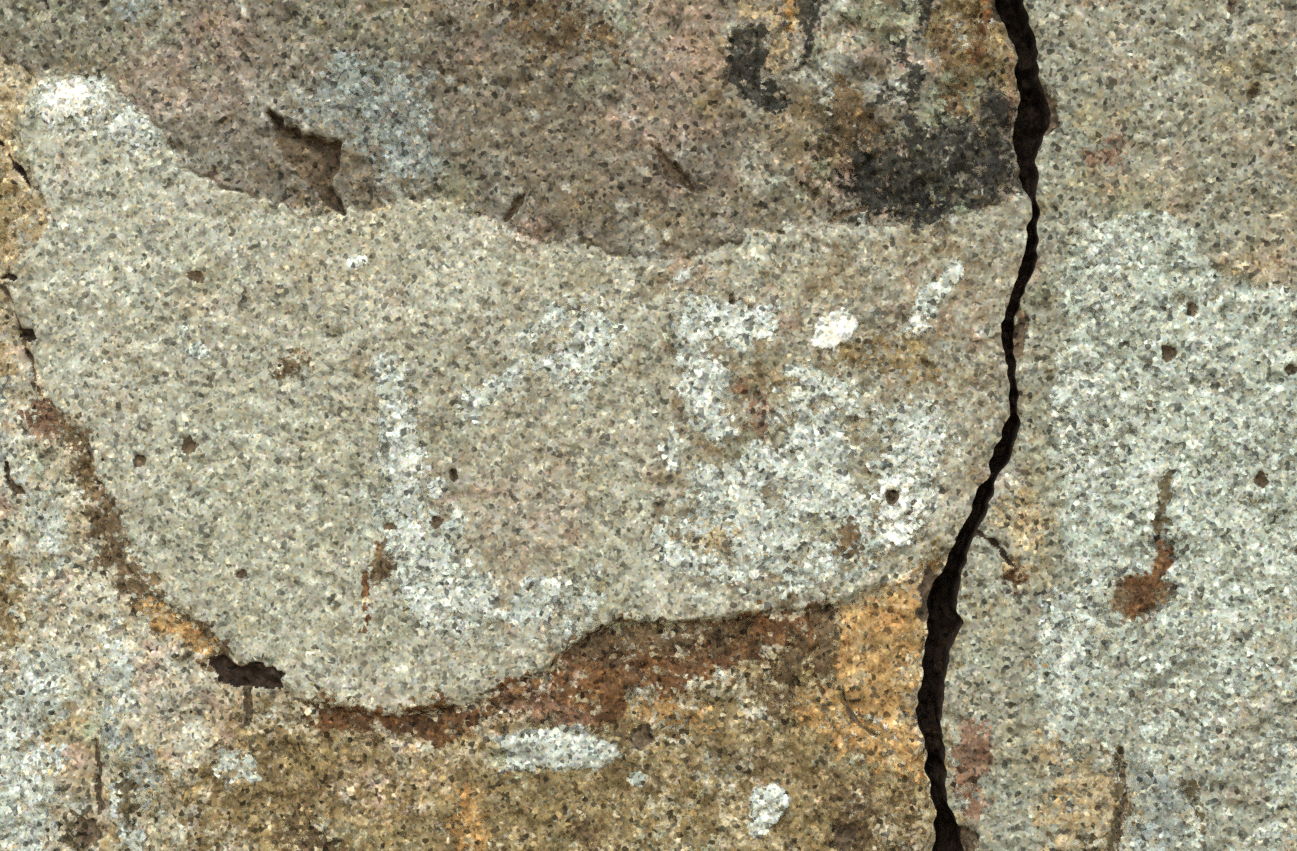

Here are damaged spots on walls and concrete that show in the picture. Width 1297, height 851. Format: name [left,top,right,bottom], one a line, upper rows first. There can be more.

leakage [799,0,1018,230]
crack [915,0,1060,851]
corrosion [1107,469,1179,626]